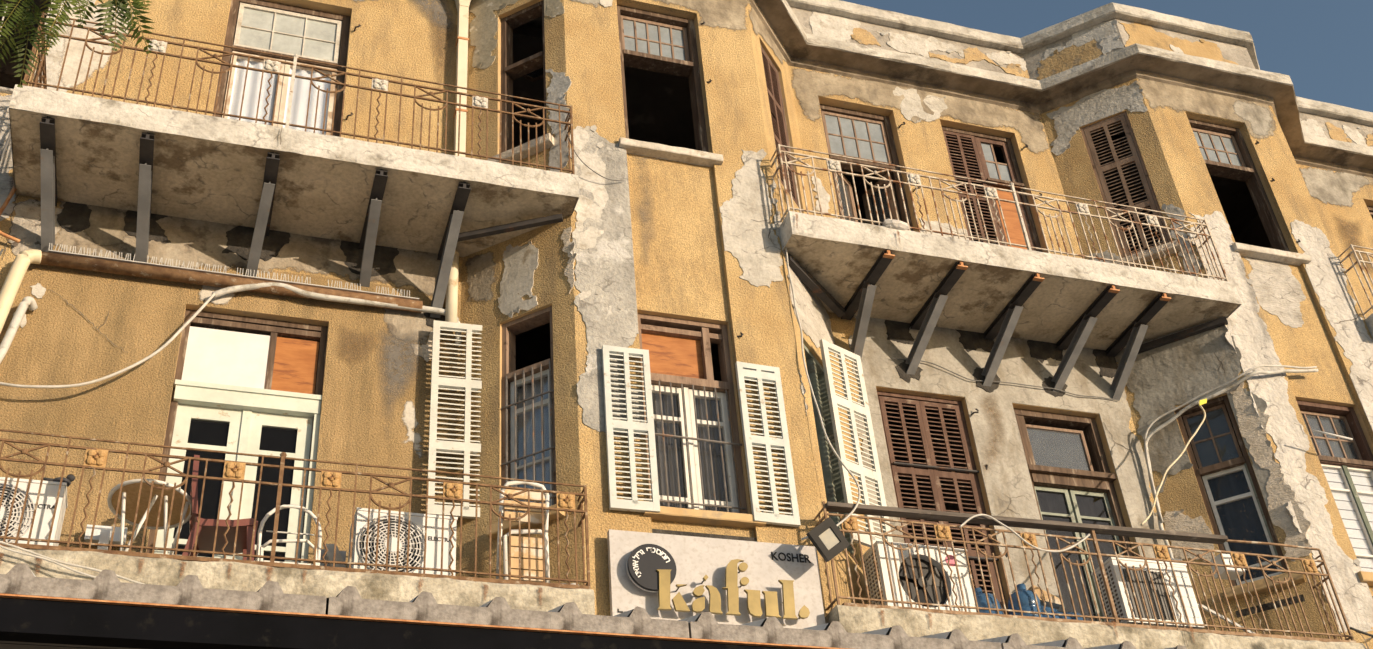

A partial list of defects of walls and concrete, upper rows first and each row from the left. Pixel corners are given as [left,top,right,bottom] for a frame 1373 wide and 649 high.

peeling [34,0,133,92]
flaking render [469,0,519,69]
flaking render [544,0,613,18]
flaking render [654,0,1276,156]
flaking render [0,95,446,362]
flaking render [465,241,539,318]
flaking render [546,69,645,440]
peeling [402,401,421,456]
flaking render [720,149,1373,633]